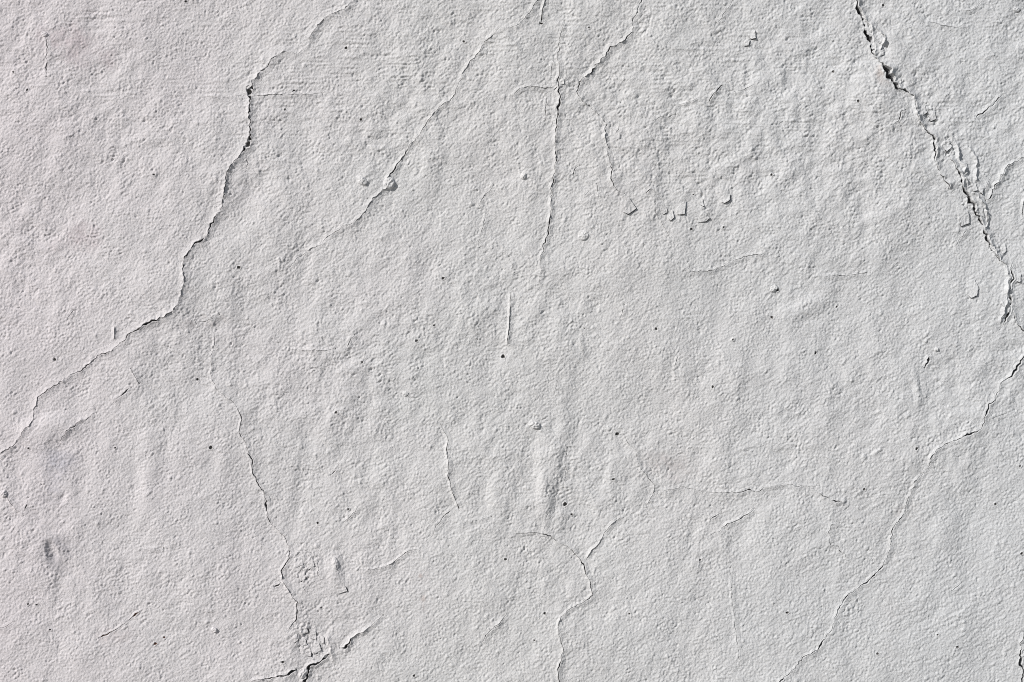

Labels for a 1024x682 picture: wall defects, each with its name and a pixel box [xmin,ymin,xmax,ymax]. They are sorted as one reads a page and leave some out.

crack [0,0,492,682]
crack [286,0,542,271]
crack [507,0,1024,682]